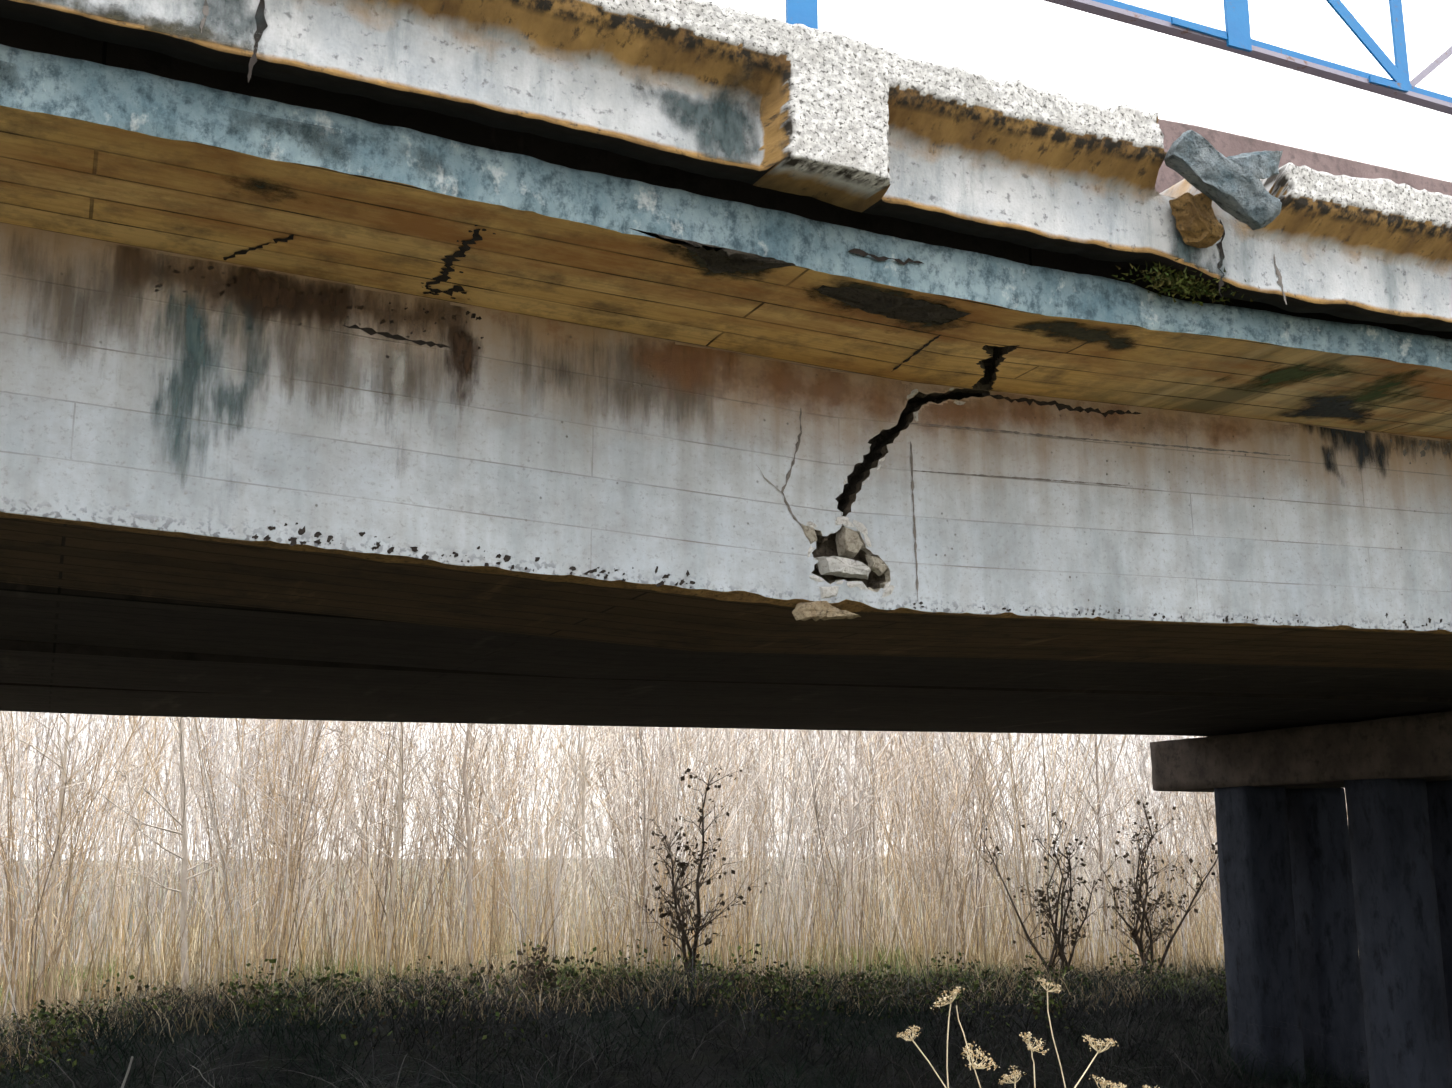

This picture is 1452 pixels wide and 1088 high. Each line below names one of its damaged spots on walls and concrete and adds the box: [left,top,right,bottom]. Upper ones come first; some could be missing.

crack [248,0,268,83]
water stain [661,85,759,164]
spalling [1164,130,1283,248]
crack [223,234,294,261]
crack [421,225,496,299]
water stain [46,245,465,459]
crack [345,324,450,348]
rust [447,329,478,398]
crack [757,408,802,528]
crack [835,335,1290,598]
spalling [792,516,895,621]